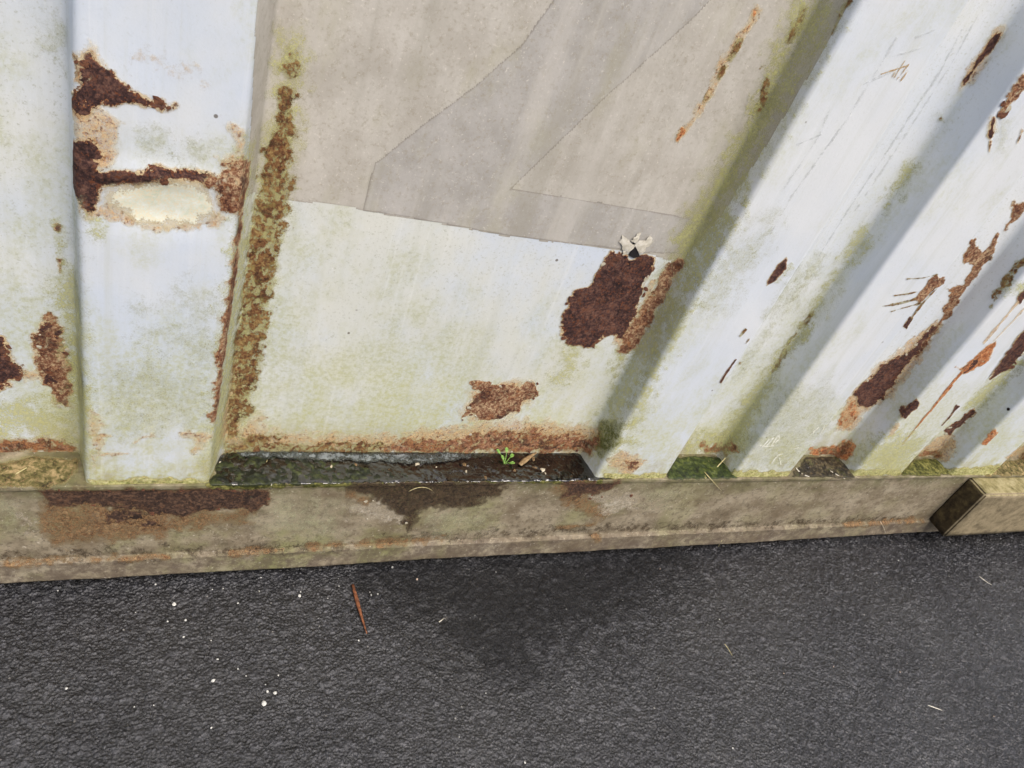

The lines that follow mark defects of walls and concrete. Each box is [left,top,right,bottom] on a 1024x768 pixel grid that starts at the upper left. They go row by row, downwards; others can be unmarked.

rust [676,4,760,142]
rust [962,27,1003,86]
rust [987,74,1024,151]
rust [0,312,84,452]
rust [71,32,924,558]
rust [809,201,1024,462]
damp [343,481,506,531]